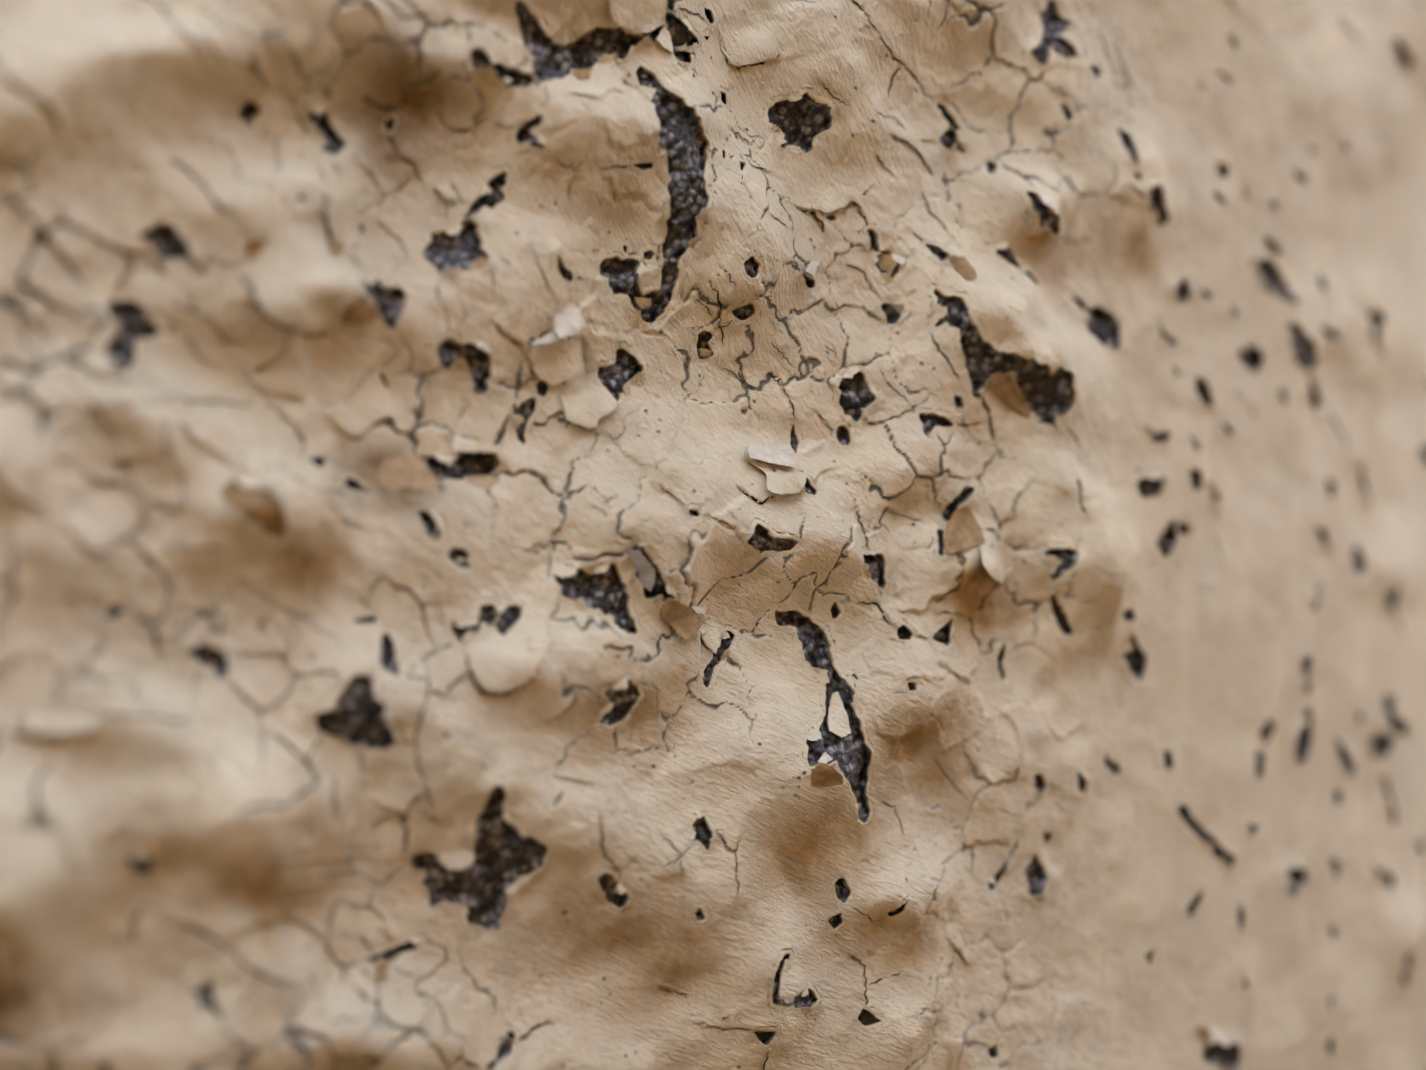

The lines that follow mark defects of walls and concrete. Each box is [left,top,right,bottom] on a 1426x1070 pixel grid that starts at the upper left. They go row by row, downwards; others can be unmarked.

spalling [464,0,785,328]
crack [771,0,950,242]
peeling [301,248,648,574]
crack [692,269,833,431]
crack [930,333,994,441]
spalling [914,239,1079,441]
crack [662,488,773,530]
spalling [307,609,407,758]
spalling [769,596,875,829]
crack [860,593,928,639]
spalling [403,779,555,937]
crack [852,956,903,1015]